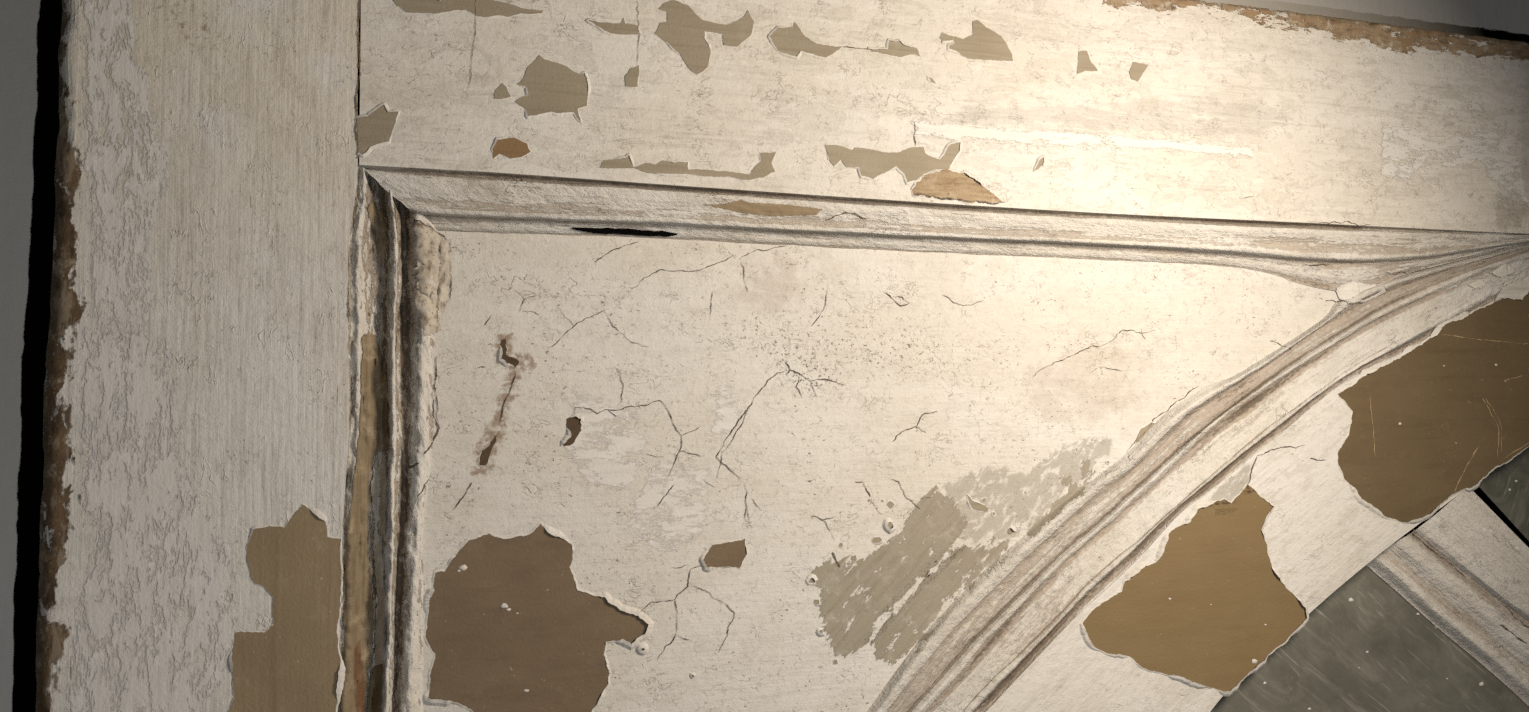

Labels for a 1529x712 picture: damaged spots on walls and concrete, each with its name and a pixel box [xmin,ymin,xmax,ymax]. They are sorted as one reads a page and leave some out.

peeling [493,55,591,124]
peeling [585,0,843,76]
crack [884,292,981,307]
peeling [227,332,389,712]
crack [387,360,472,510]
peeling [422,521,654,712]
crack [485,241,843,521]
crack [642,564,735,660]
crack [816,516,840,567]
crack [857,479,931,514]
peeling [1079,483,1309,696]
peeling [1335,262,1529,524]